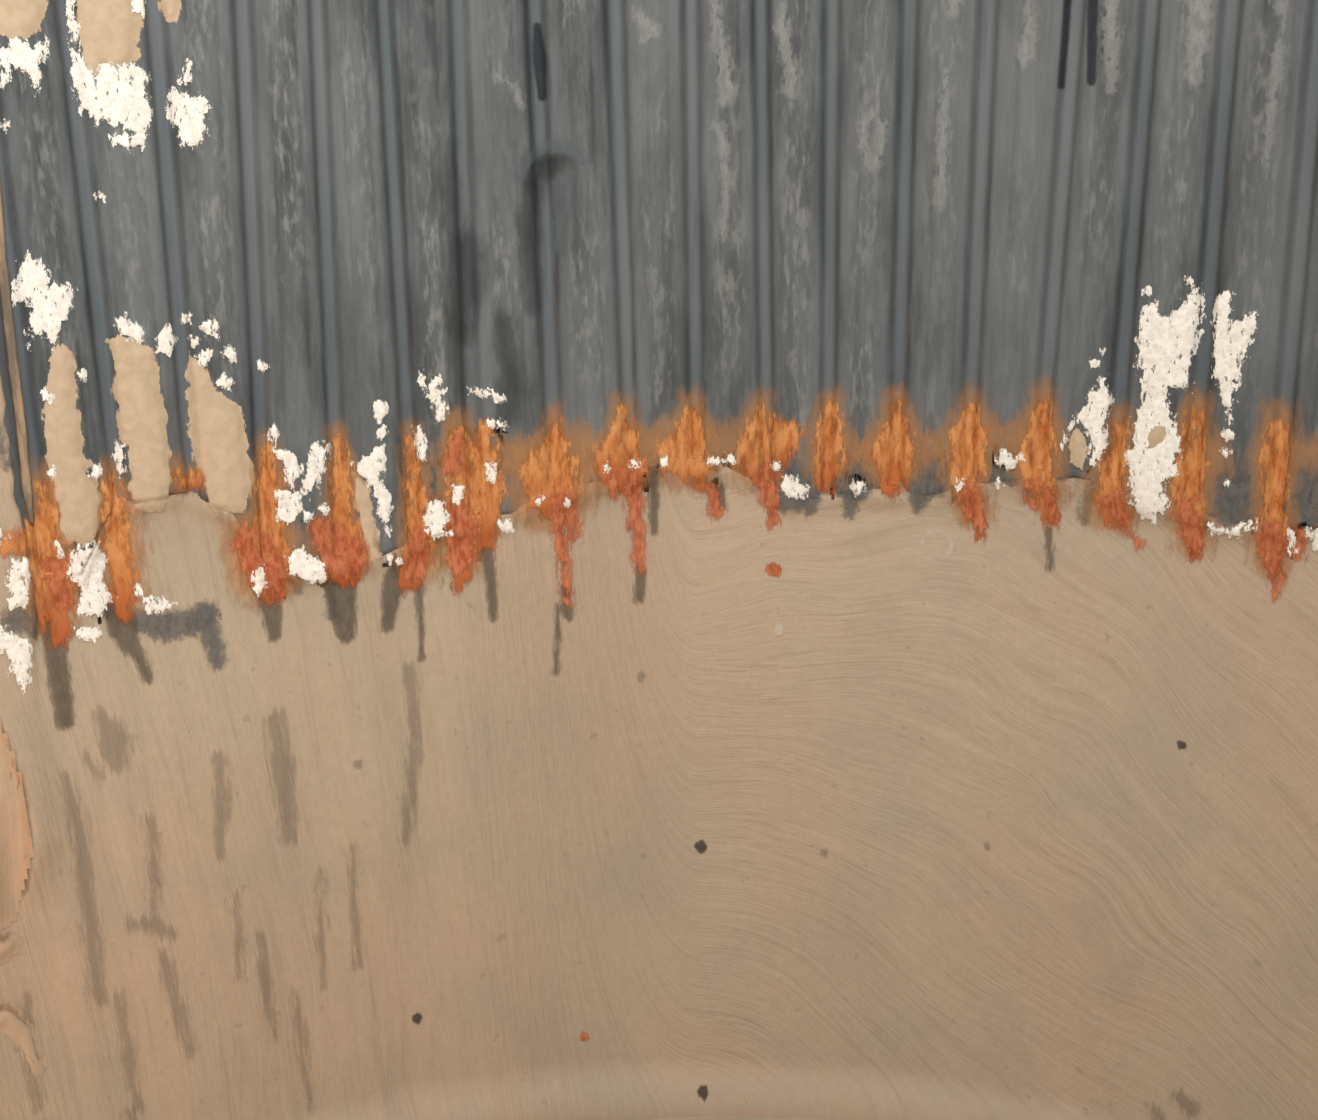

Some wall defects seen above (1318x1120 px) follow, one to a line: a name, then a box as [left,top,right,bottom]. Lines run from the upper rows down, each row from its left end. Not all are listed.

peeling [0,35,50,91]
peeling [65,0,212,154]
peeling [11,250,78,351]
peeling [113,311,237,391]
peeling [1060,347,1115,467]
peeling [1124,275,1259,526]
corrosion [0,480,79,729]
corrosion [96,469,151,683]
damp [126,603,225,669]
corrosion [229,442,291,640]
corrosion [306,434,369,642]
corrosion [382,404,725,674]